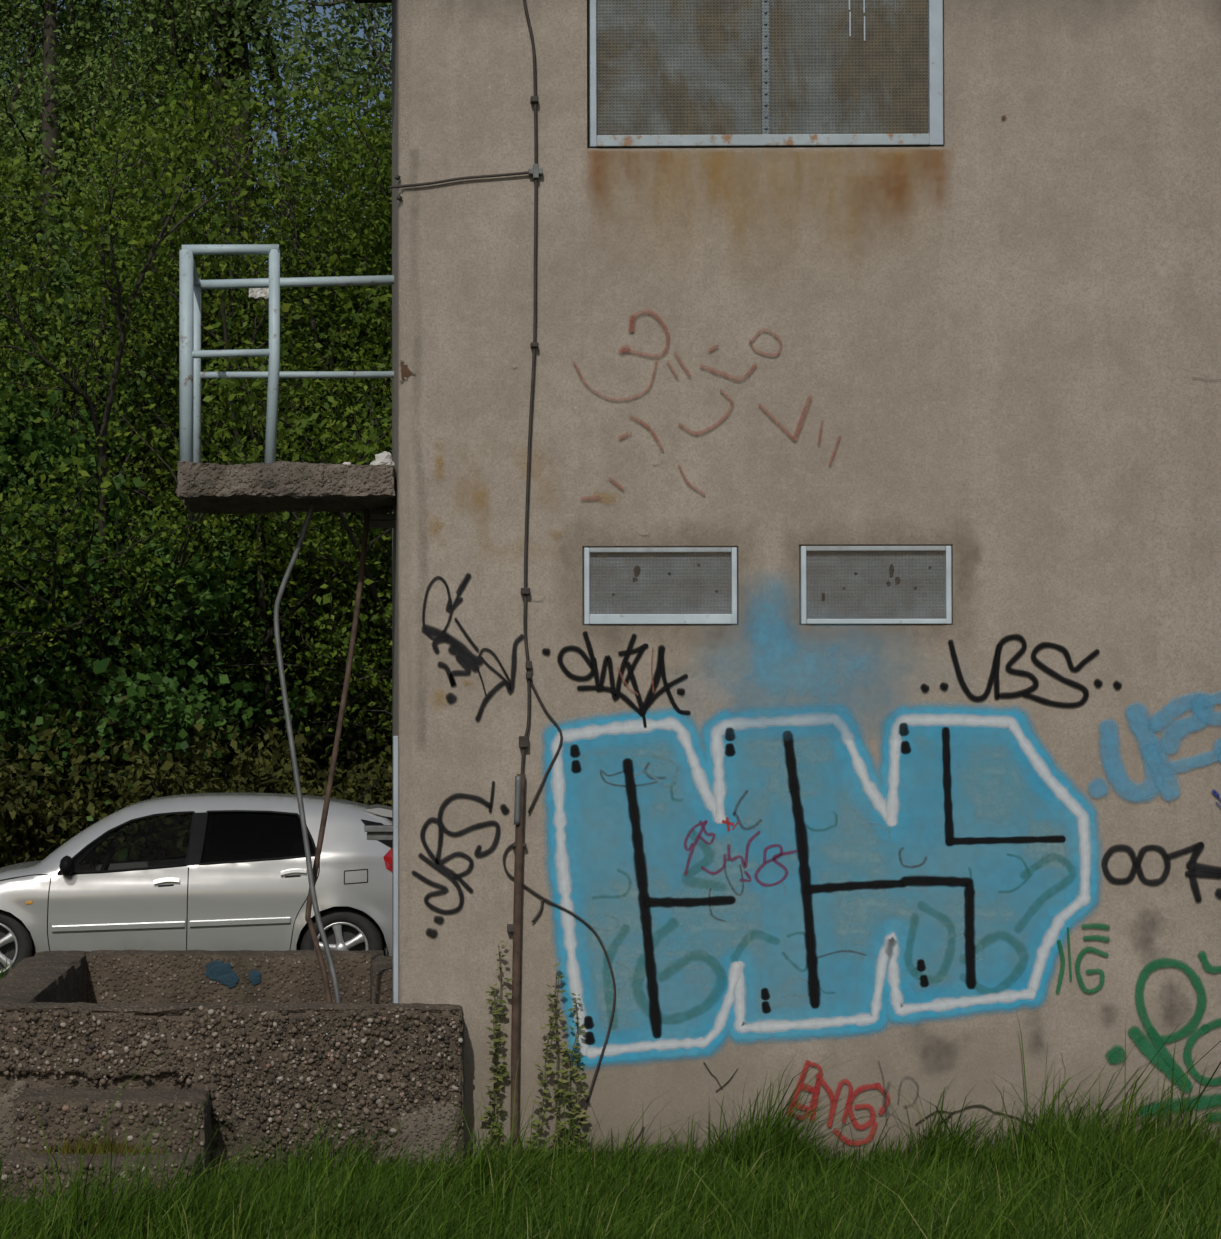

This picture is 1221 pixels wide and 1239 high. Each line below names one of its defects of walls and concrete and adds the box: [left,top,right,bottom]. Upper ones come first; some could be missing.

spalling [0,1005,463,1208]